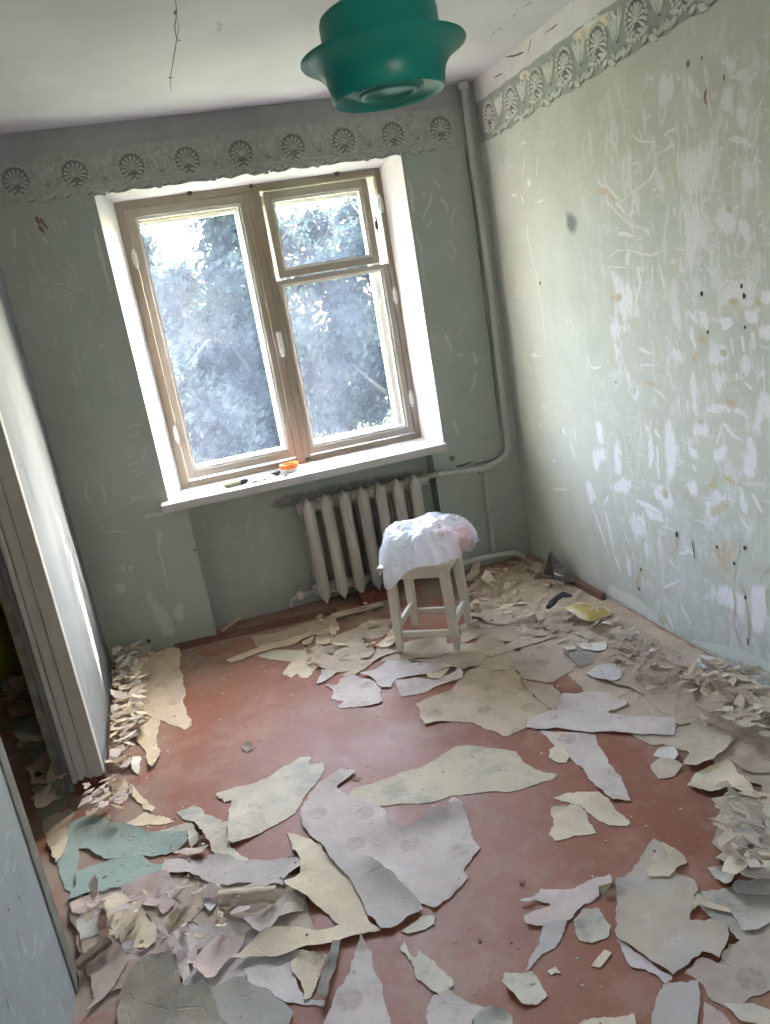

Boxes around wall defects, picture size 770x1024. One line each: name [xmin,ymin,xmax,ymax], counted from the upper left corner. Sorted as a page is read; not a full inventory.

peeling [585,51,770,631]
peeling [697,579,770,645]